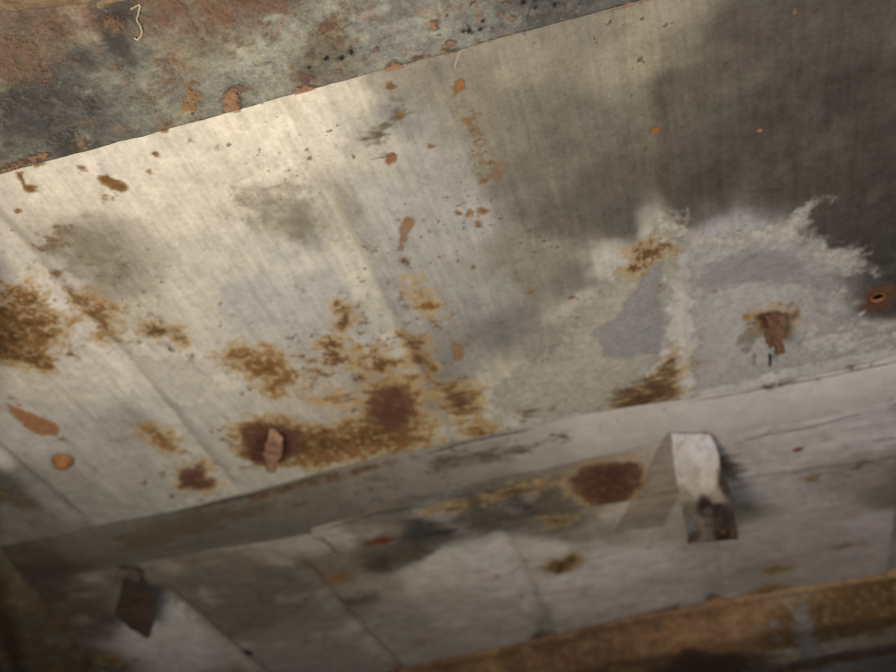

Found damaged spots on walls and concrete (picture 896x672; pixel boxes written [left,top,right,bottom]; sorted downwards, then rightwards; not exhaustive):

corrosion [397,217,422,264]
corrosion [455,208,488,228]
corrosion [619,235,679,283]
corrosion [0,276,193,374]
corrosion [400,273,442,330]
leakage [491,202,896,421]
corrosion [210,298,510,503]
corrosion [604,346,691,411]
corrosion [128,421,227,512]
corrosion [420,455,648,522]
corrosion [525,553,585,578]
leakage [665,648,754,672]